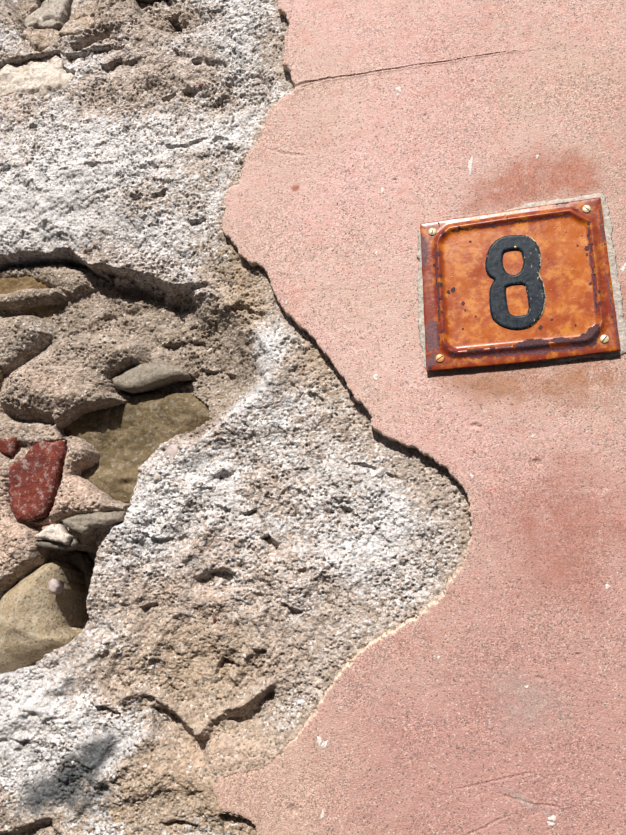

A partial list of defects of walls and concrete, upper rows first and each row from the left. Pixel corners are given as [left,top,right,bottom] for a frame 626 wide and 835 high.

crack [294,45,557,90]
rust [421,202,620,370]
spalling [0,0,473,835]